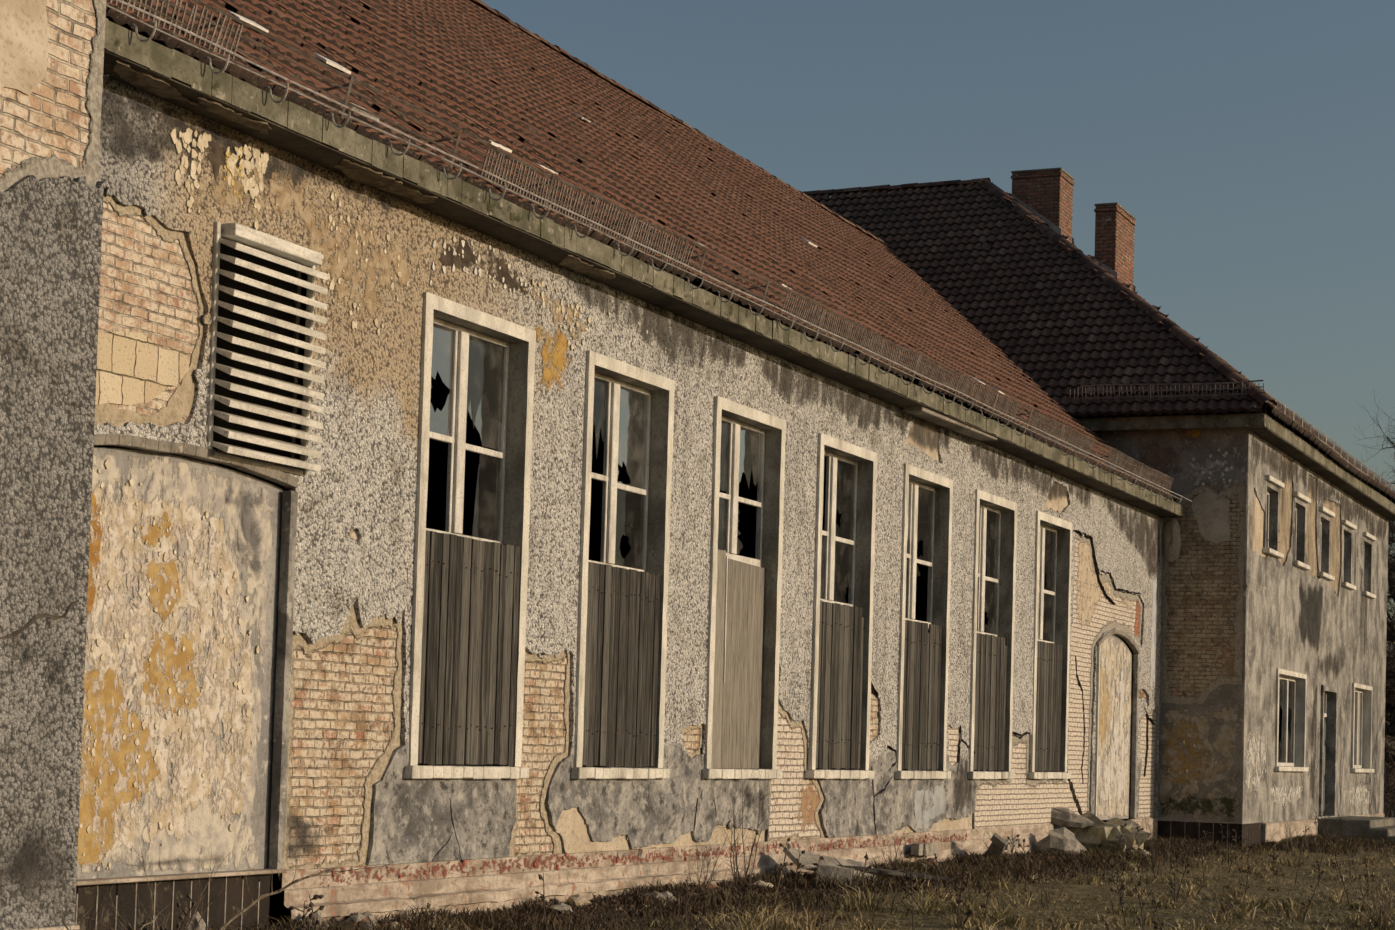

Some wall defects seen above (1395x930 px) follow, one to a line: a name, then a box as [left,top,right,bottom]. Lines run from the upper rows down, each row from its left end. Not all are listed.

spalling [0,0,212,433]
peeling [170,128,416,334]
peeling [523,278,593,351]
peeling [77,454,272,873]
spalling [278,449,1342,887]
crack [1073,530,1140,605]